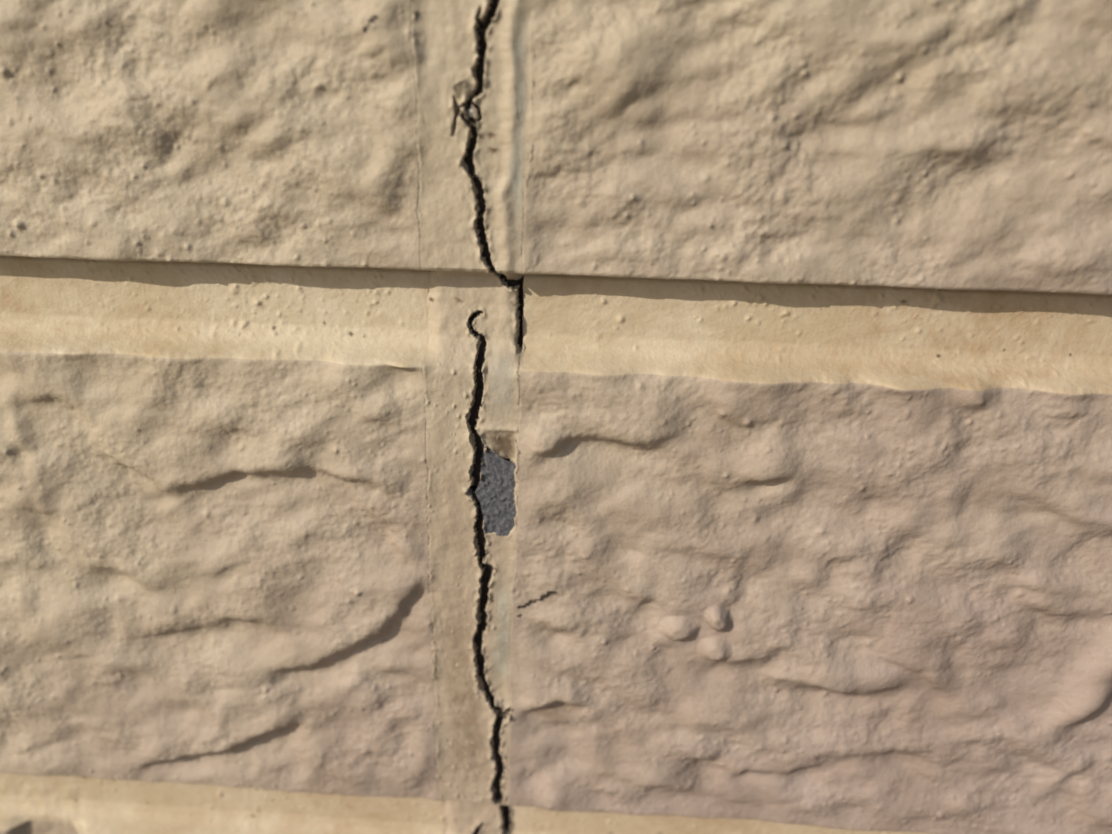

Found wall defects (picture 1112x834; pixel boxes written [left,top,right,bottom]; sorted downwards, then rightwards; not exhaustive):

crack [453,0,524,404]
crack [466,311,513,834]
peeling [476,435,516,536]
crack [517,591,556,617]